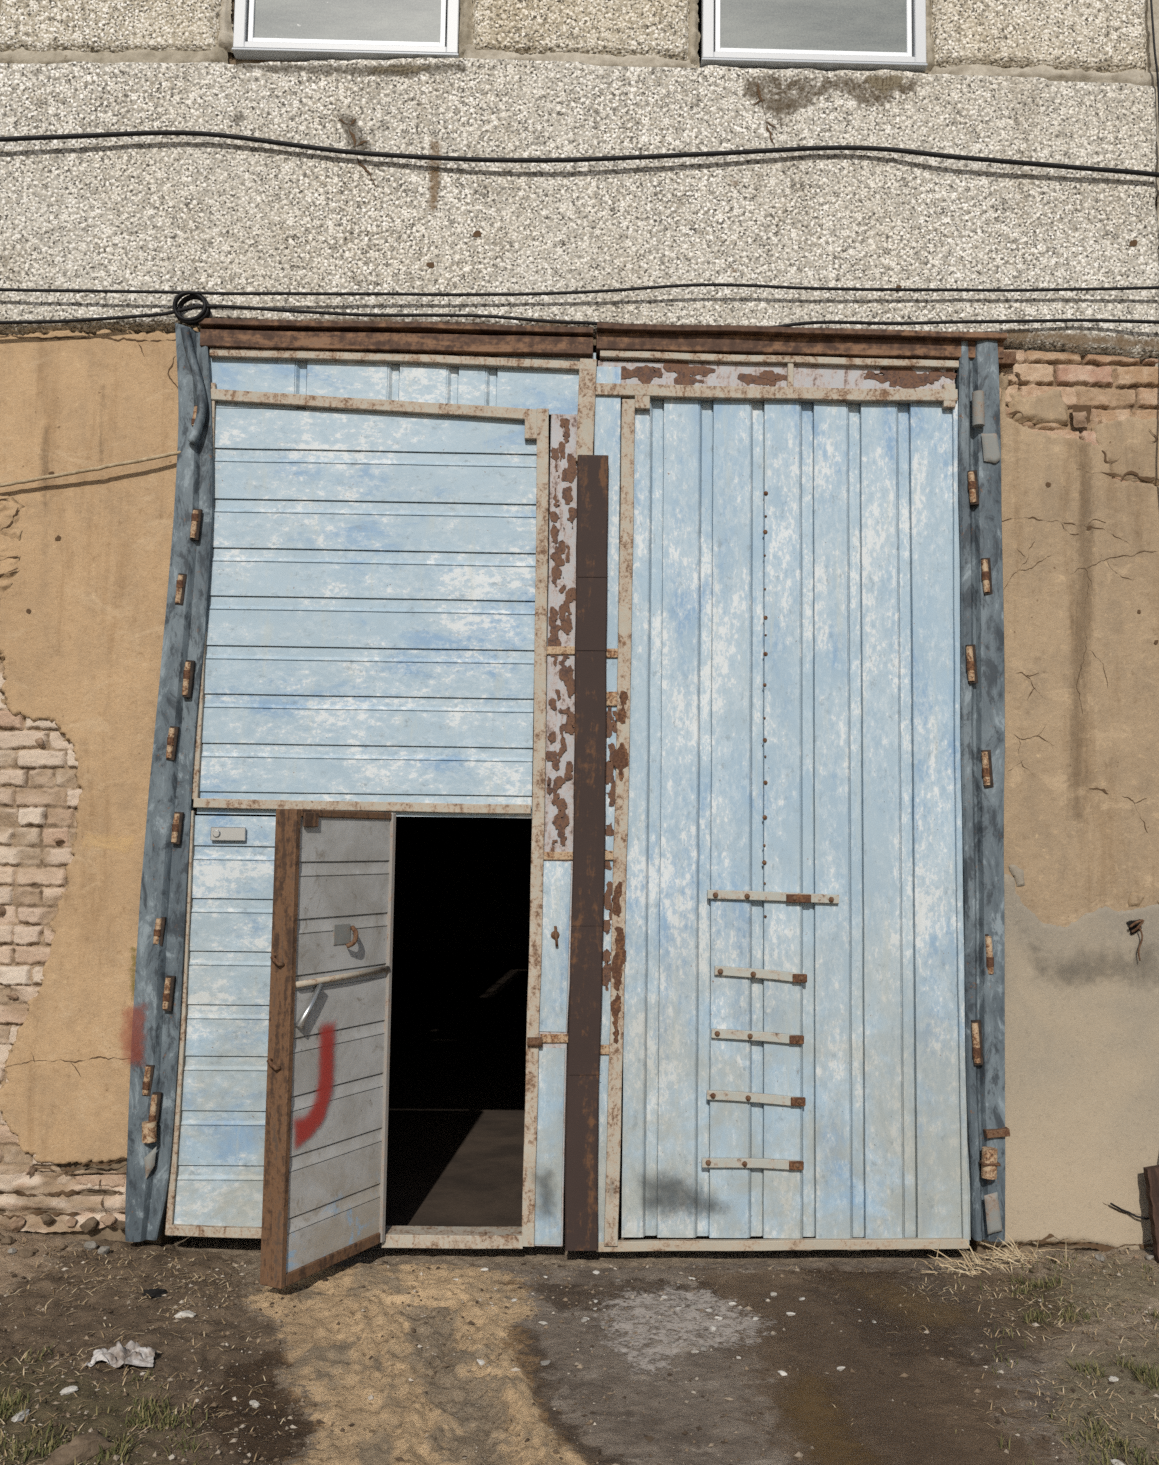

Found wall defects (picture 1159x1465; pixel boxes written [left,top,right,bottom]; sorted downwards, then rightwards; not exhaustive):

damp [745,73,916,125]
spalling [999,350,1159,486]
crack [1004,516,1154,713]
rust [613,742,629,781]
rust [615,691,628,724]
crack [1009,672,1050,776]
crack [1089,788,1148,831]
spalling [0,659,82,1088]
rust [610,881,626,1044]
peeling [982,865,1159,1250]
spalling [0,1111,127,1233]